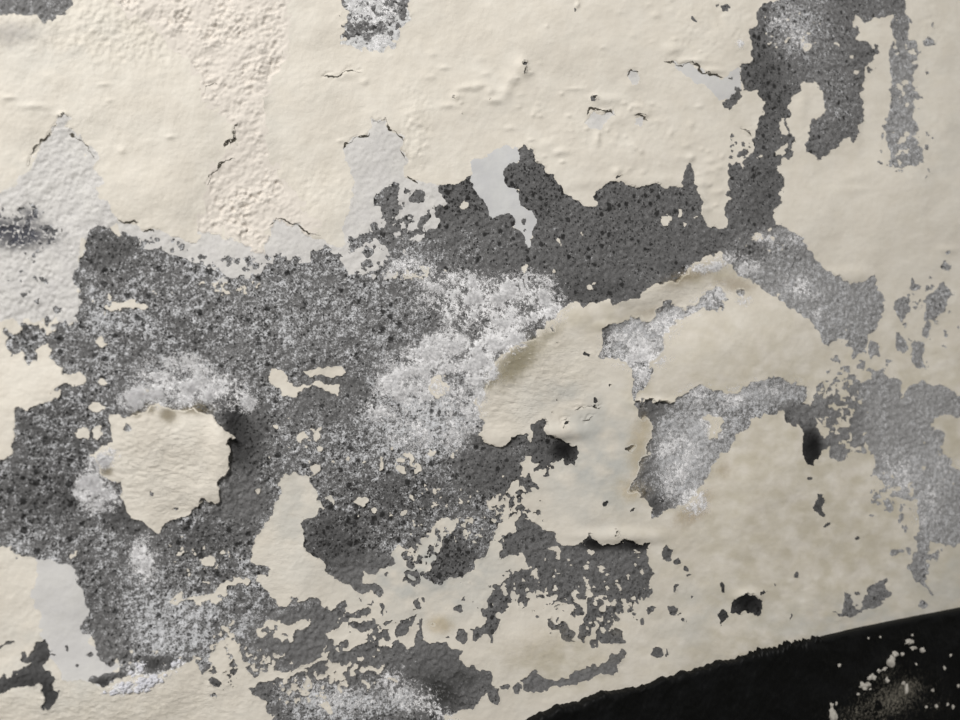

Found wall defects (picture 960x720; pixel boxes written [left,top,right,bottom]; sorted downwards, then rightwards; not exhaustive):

peeling [339,0,411,53]
crack [664,61,722,78]
crack [208,124,237,183]
crack [343,117,418,184]
crack [270,218,310,234]
peeling [893,276,955,369]
peeling [598,286,807,519]
peeling [811,355,960,596]
peeling [470,506,655,648]
peeling [717,583,776,626]
peeling [0,639,60,710]
peeling [513,649,627,694]